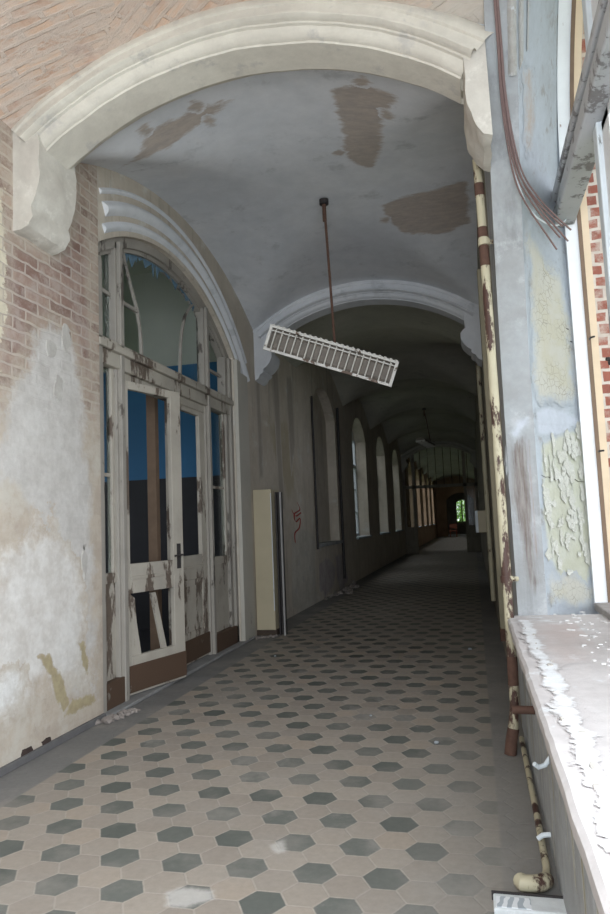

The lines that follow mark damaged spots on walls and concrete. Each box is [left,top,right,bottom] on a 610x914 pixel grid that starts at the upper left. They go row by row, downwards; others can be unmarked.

flaking render [328,74,401,170]
flaking render [378,180,472,236]
flaking render [0,185,101,720]
damp [0,501,96,732]
peeling [517,421,610,852]